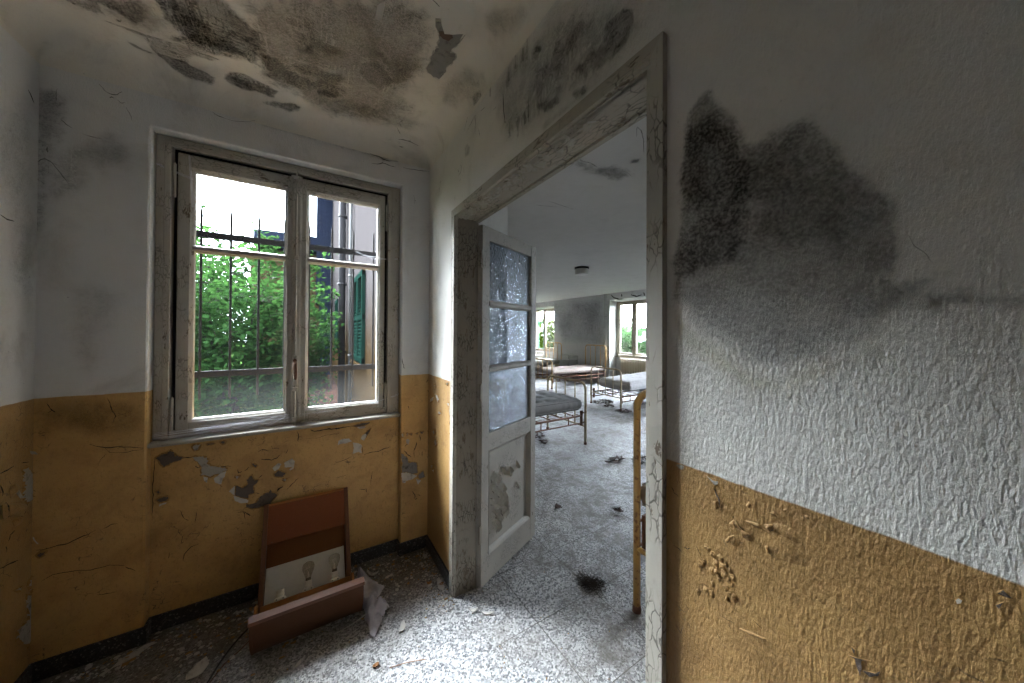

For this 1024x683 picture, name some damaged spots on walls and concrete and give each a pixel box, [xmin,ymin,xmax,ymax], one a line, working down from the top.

damp [70,0,426,117]
flaking render [426,18,463,80]
mould [681,117,754,272]
peeling [154,440,295,509]
peeling [338,422,371,454]
peeling [400,368,455,484]
peeling [490,460,521,533]
peeling [725,502,787,543]